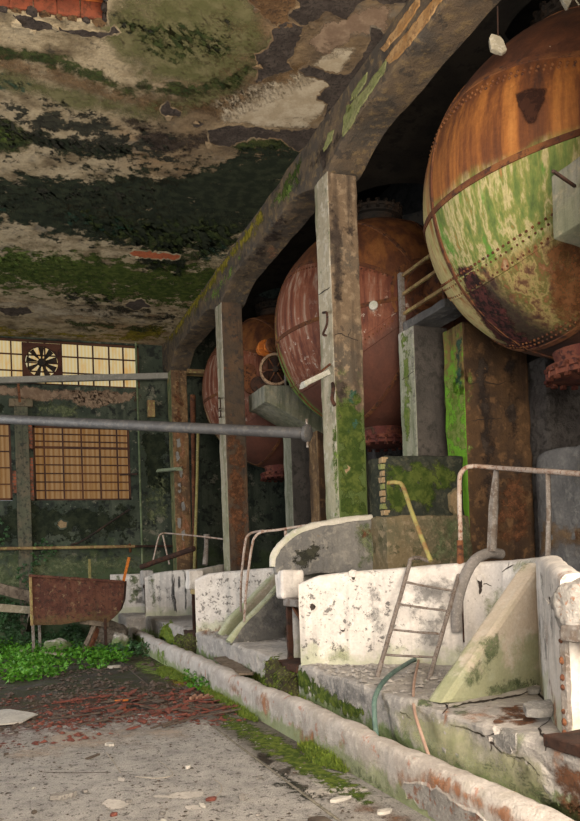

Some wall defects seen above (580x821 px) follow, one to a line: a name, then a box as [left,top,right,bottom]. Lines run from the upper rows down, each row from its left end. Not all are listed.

spalling [0,0,122,40]
flaking render [191,0,442,152]
water stain [0,5,391,267]
flaking render [127,248,181,262]
water stain [330,205,354,300]
rust [539,525,580,553]
crack [442,692,551,776]
flaking render [401,781,491,821]
rust [413,770,513,821]
rust [550,751,580,818]